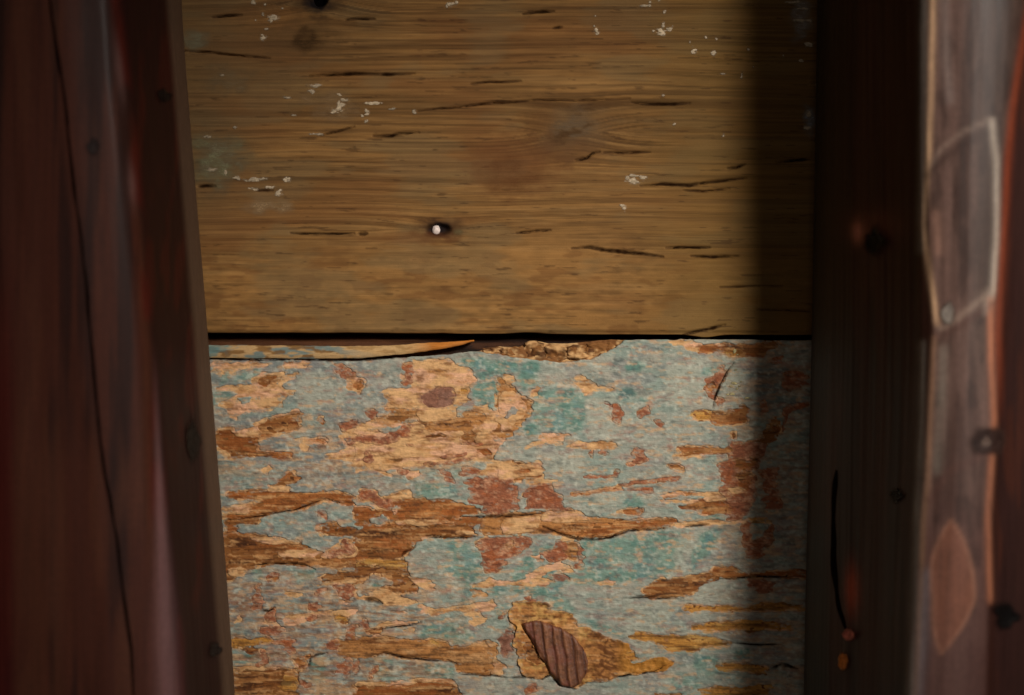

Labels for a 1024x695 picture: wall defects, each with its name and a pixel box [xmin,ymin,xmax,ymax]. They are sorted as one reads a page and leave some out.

spalling [482,340,616,361]
peeling [574,374,664,428]
spalling [669,339,782,439]
peeling [210,358,617,688]
peeling [583,445,775,559]
crack [830,470,847,630]
peeling [524,683,539,695]